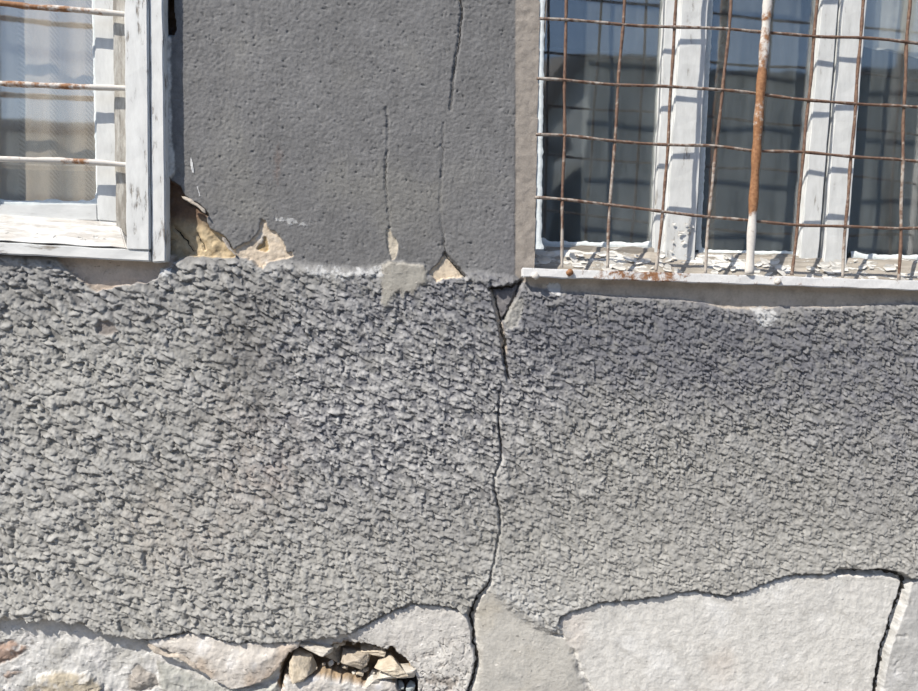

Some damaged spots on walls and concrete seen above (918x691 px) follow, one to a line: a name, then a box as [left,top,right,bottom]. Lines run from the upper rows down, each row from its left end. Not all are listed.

crack [441,0,463,177]
flaking render [59,180,294,291]
peeling [387,229,399,259]
flaking render [430,255,463,281]
crack [346,280,522,691]
flaking render [147,631,417,689]
crack [847,568,905,691]